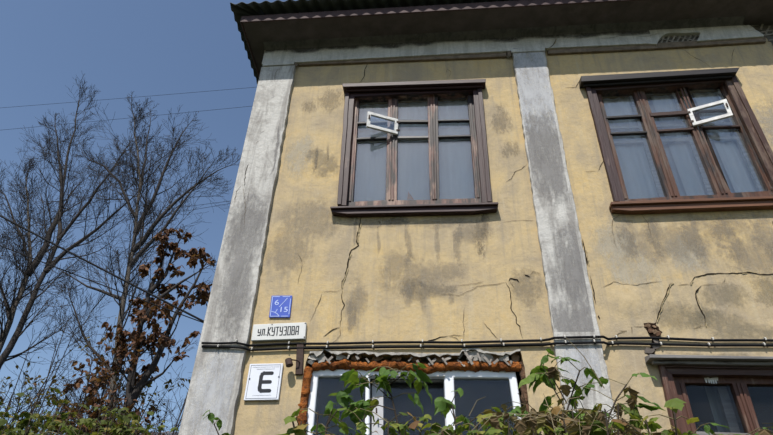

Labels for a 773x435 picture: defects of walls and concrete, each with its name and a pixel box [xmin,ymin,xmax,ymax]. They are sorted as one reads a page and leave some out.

crack [311,217,362,342]
crack [443,271,538,348]
crack [582,241,773,329]